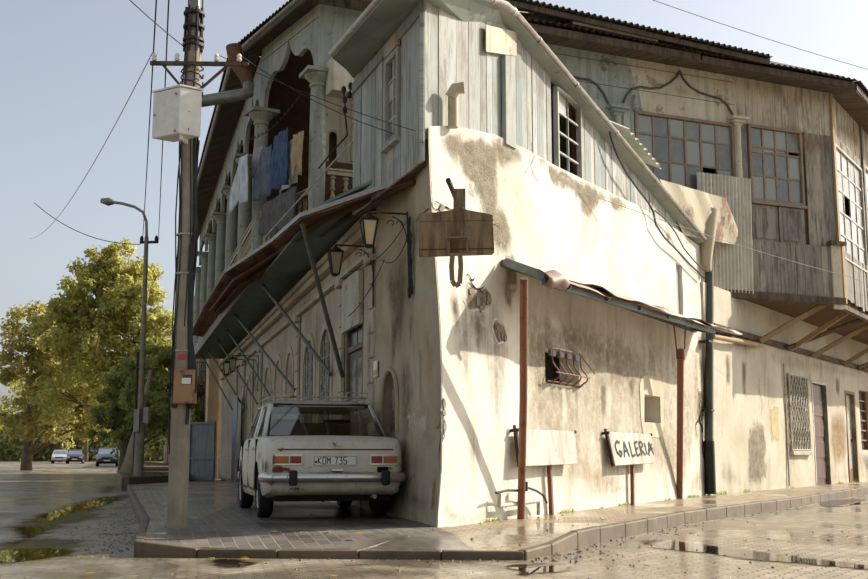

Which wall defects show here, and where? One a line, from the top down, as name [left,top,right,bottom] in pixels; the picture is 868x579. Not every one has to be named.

peeling [446,135,519,306]
flaking render [463,282,507,345]
water stain [749,426,766,482]
water stain [832,420,844,460]